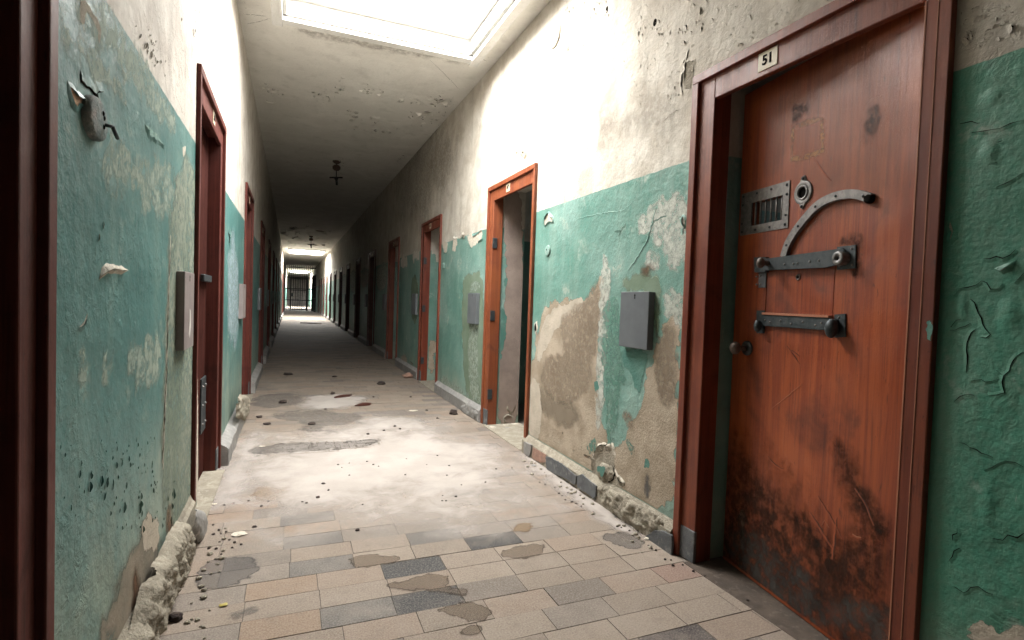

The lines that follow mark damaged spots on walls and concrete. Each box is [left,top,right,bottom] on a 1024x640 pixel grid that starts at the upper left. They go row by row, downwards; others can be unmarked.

peeling [67,80,86,112]
peeling [76,0,182,219]
spalling [637,0,753,99]
crack [576,199,684,270]
flaking render [428,192,680,509]
crack [950,249,1024,404]
crack [959,442,1024,472]
spalling [79,437,196,640]
crack [949,528,993,597]
crack [993,533,1024,544]